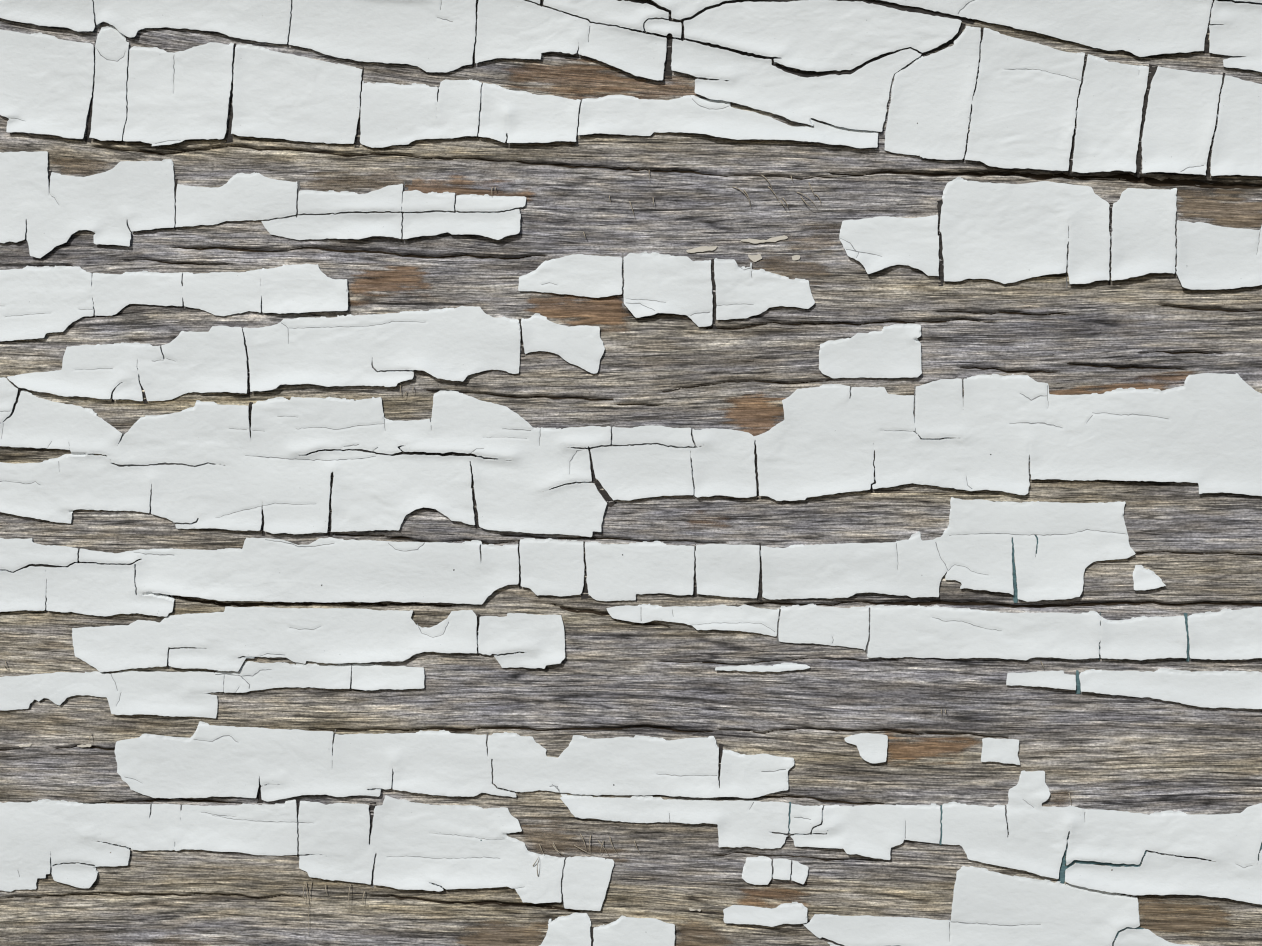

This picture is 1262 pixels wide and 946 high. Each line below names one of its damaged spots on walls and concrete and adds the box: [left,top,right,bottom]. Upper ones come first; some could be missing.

peeling [0,0,1262,290]
crack [85,0,1262,330]
peeling [518,235,815,327]
crack [0,376,22,439]
crack [79,345,174,404]
crack [113,312,1262,695]
crack [8,548,172,573]
peeling [0,264,1262,946]
crack [1058,808,1262,884]
crack [949,919,1041,941]
crack [1112,927,1144,946]